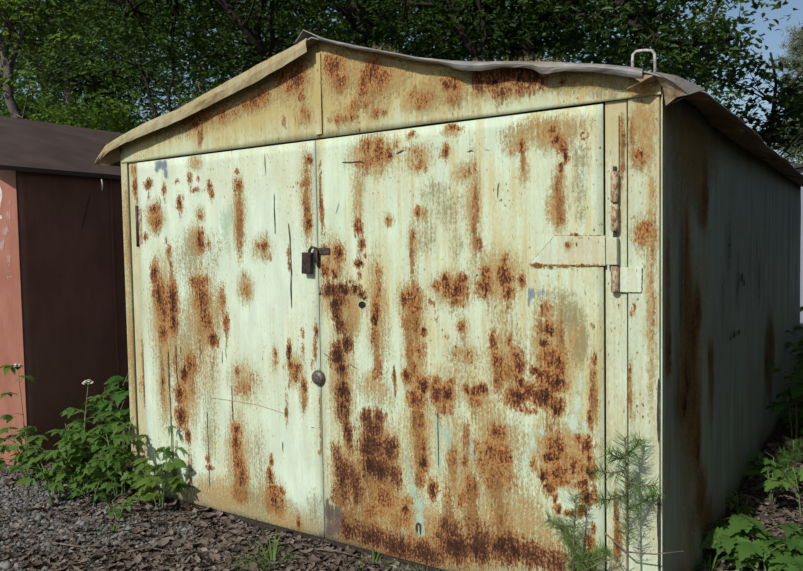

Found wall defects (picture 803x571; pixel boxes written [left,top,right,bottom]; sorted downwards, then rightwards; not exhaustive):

rust [123,156,319,535]
rust [172,47,607,145]
rust [297,115,603,571]
rust [619,79,715,549]